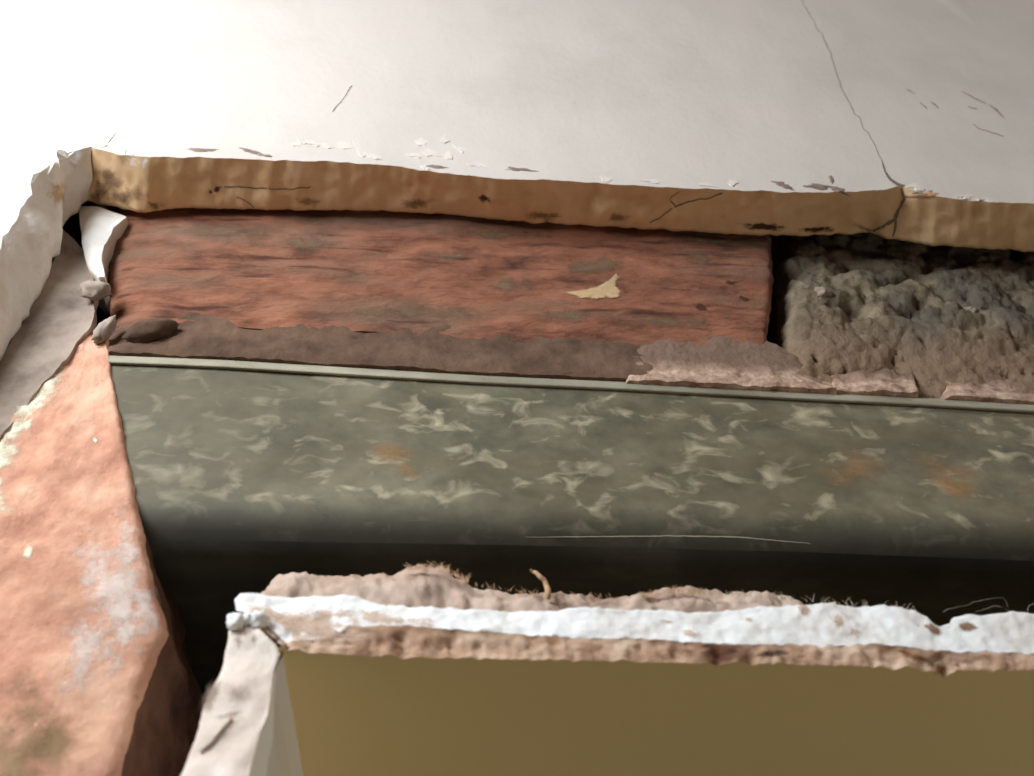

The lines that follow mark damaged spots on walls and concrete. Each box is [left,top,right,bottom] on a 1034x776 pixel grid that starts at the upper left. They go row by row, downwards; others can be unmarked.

crack [802,0,936,237]
peeling [405,135,488,172]
spalling [771,175,851,197]
spalling [906,183,940,198]
crack [650,191,723,223]